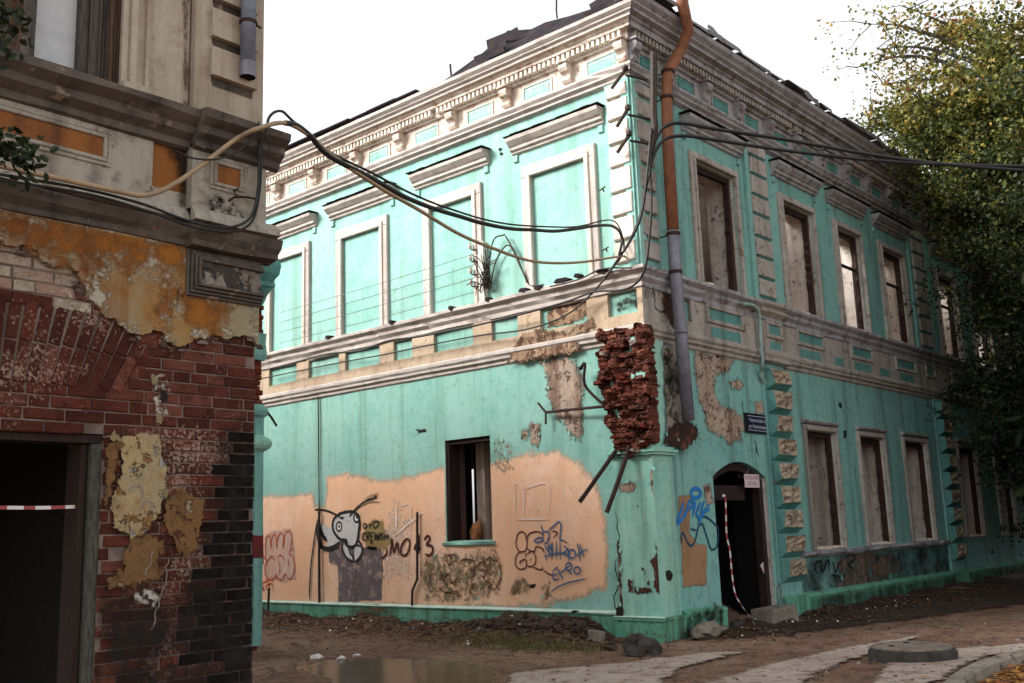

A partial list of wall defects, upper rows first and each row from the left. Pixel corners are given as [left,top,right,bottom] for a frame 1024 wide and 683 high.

peeling [175,336,230,352]
spalling [506,301,745,458]
peeling [614,541,660,622]